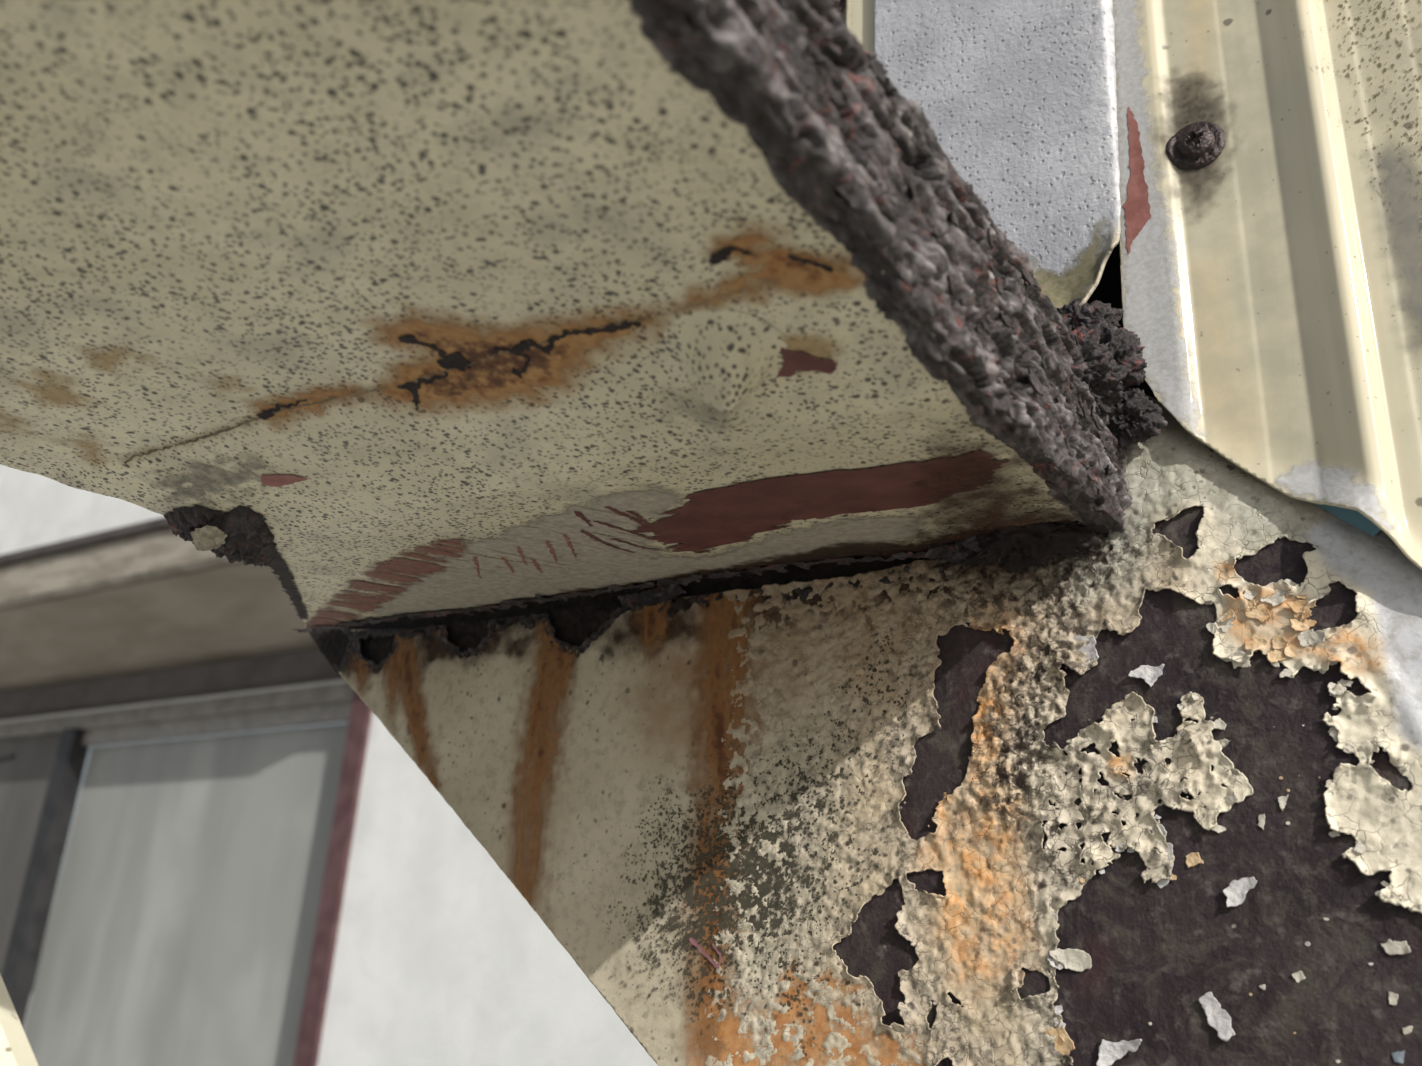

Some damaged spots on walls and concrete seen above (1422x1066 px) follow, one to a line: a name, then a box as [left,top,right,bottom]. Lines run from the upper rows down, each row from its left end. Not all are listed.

corrosion [689,233,863,306]
corrosion [253,387,361,422]
crack [124,260,845,464]
corrosion [378,310,652,411]
corrosion [1056,297,1168,450]
peeling [1152,506,1204,559]
peeling [1276,461,1395,530]
corrosion [163,447,1101,1066]
damp [607,628,924,1056]
peeling [899,623,1014,841]
peeling [1017,537,1422,1066]
peeling [927,992,964,1028]